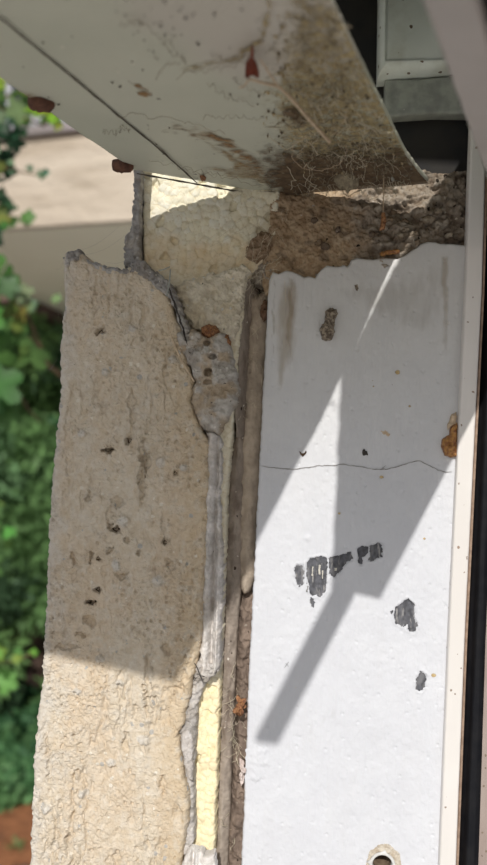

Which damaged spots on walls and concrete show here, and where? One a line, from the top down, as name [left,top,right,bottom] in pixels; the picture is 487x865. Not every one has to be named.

spalling [63,170,467,435]
peeling [294,543,383,608]
peeling [390,598,418,632]
peeling [416,671,427,691]
flaking render [179,660,220,865]